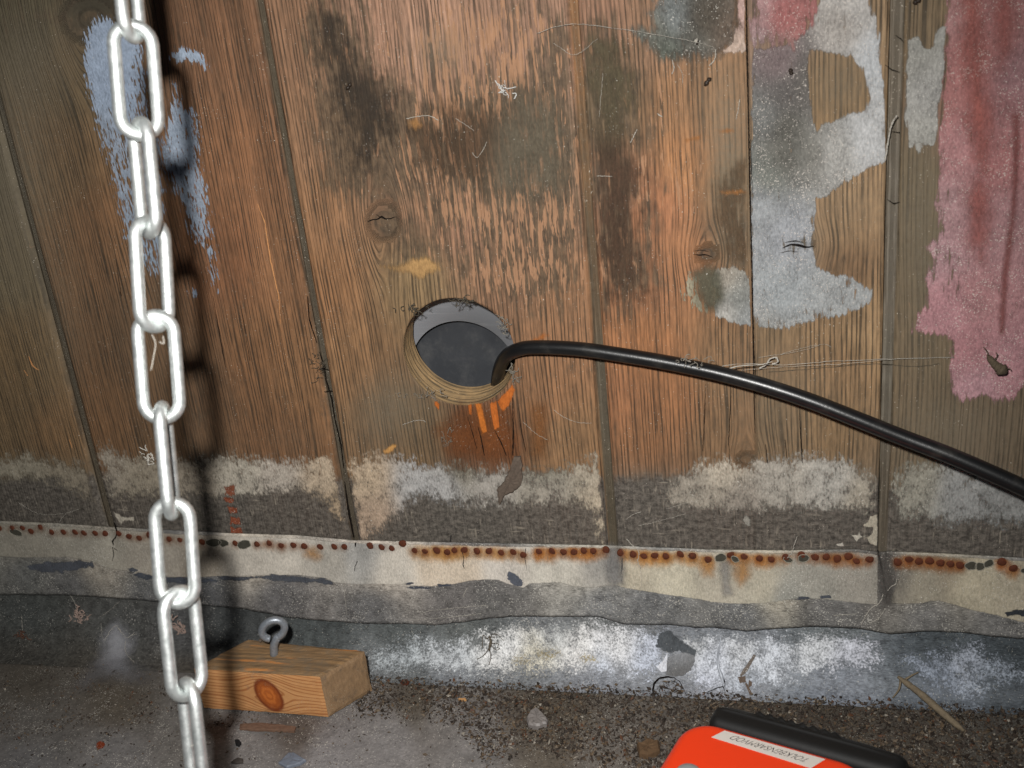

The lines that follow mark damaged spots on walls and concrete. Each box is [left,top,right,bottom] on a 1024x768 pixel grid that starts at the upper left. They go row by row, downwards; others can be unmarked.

peeling [83,16,150,241]
peeling [155,81,220,293]
peeling [169,47,210,70]
leakage [413,91,564,200]
peeling [680,0,886,329]
peeling [904,0,1024,403]
leakage [0,524,152,576]
leakage [97,446,160,500]
crack [307,296,358,571]
leakage [163,386,878,604]
corrosion [411,546,713,573]
leakage [891,461,1024,530]